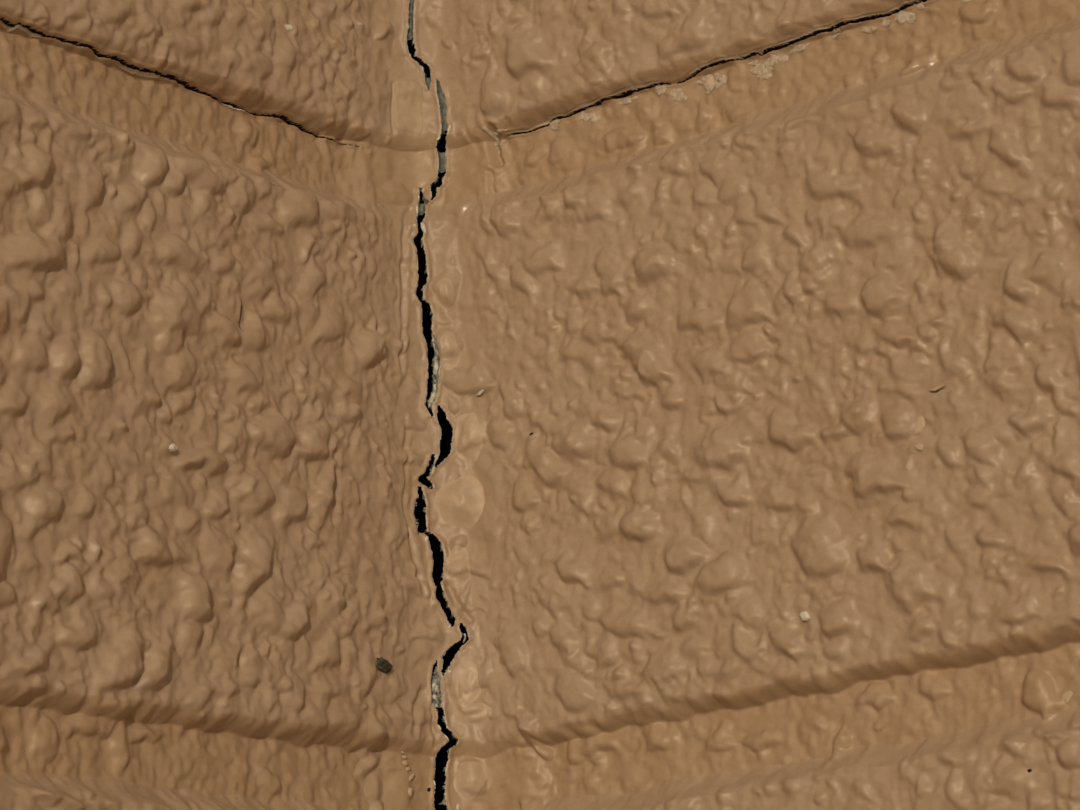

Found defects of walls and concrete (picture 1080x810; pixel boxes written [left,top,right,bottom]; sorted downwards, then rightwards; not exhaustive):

crack [0,17,357,147]
crack [505,0,927,135]
crack [406,0,469,810]